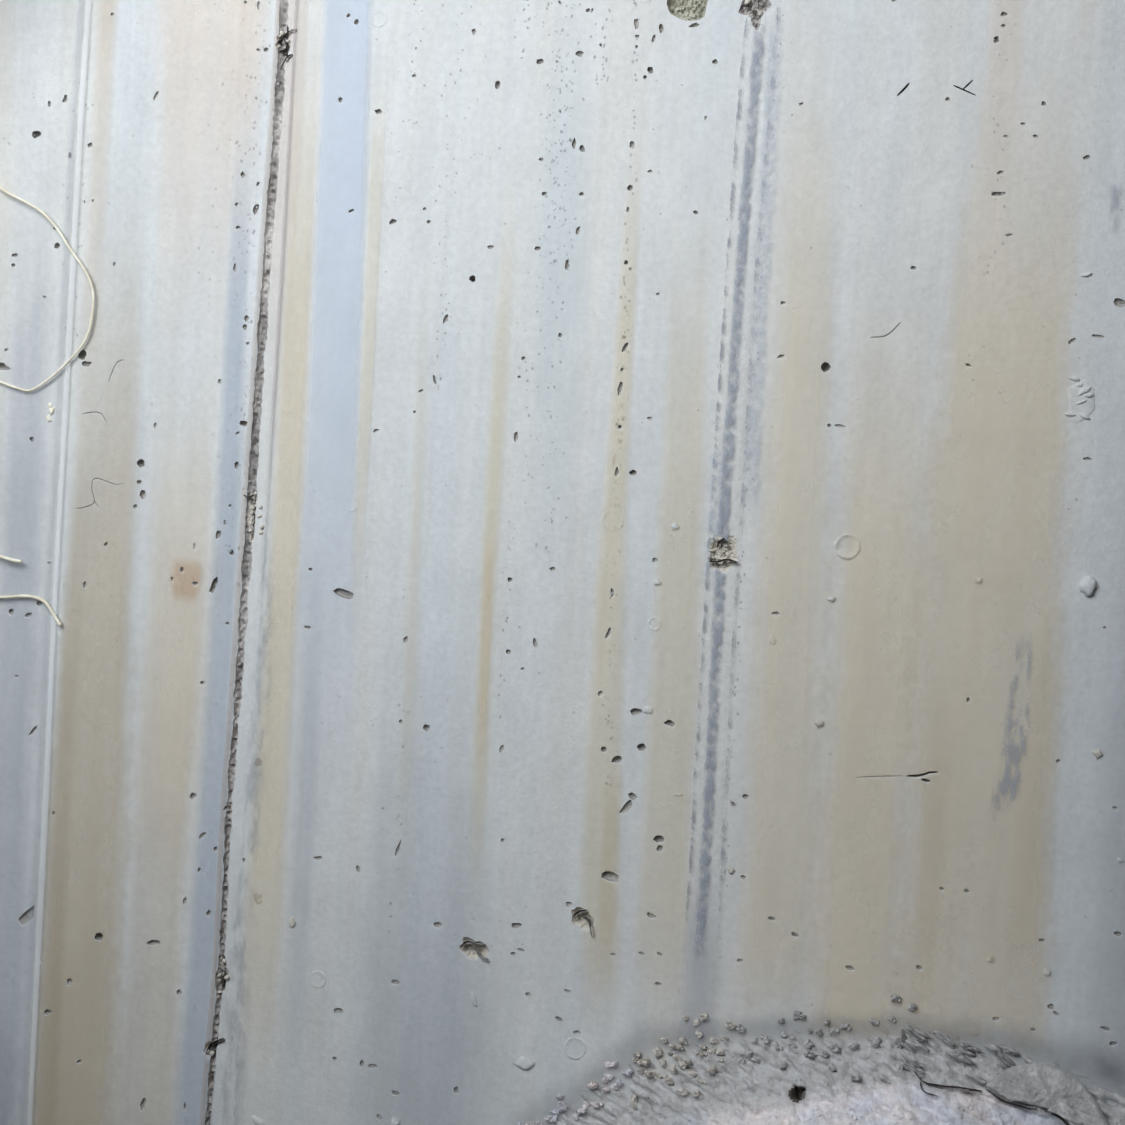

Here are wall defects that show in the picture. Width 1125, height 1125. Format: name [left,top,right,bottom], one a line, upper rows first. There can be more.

spalling [634,0,708,43]
spalling [738,0,772,30]
water stain [708,19,774,544]
spalling [708,536,738,571]
water stain [687,561,738,931]